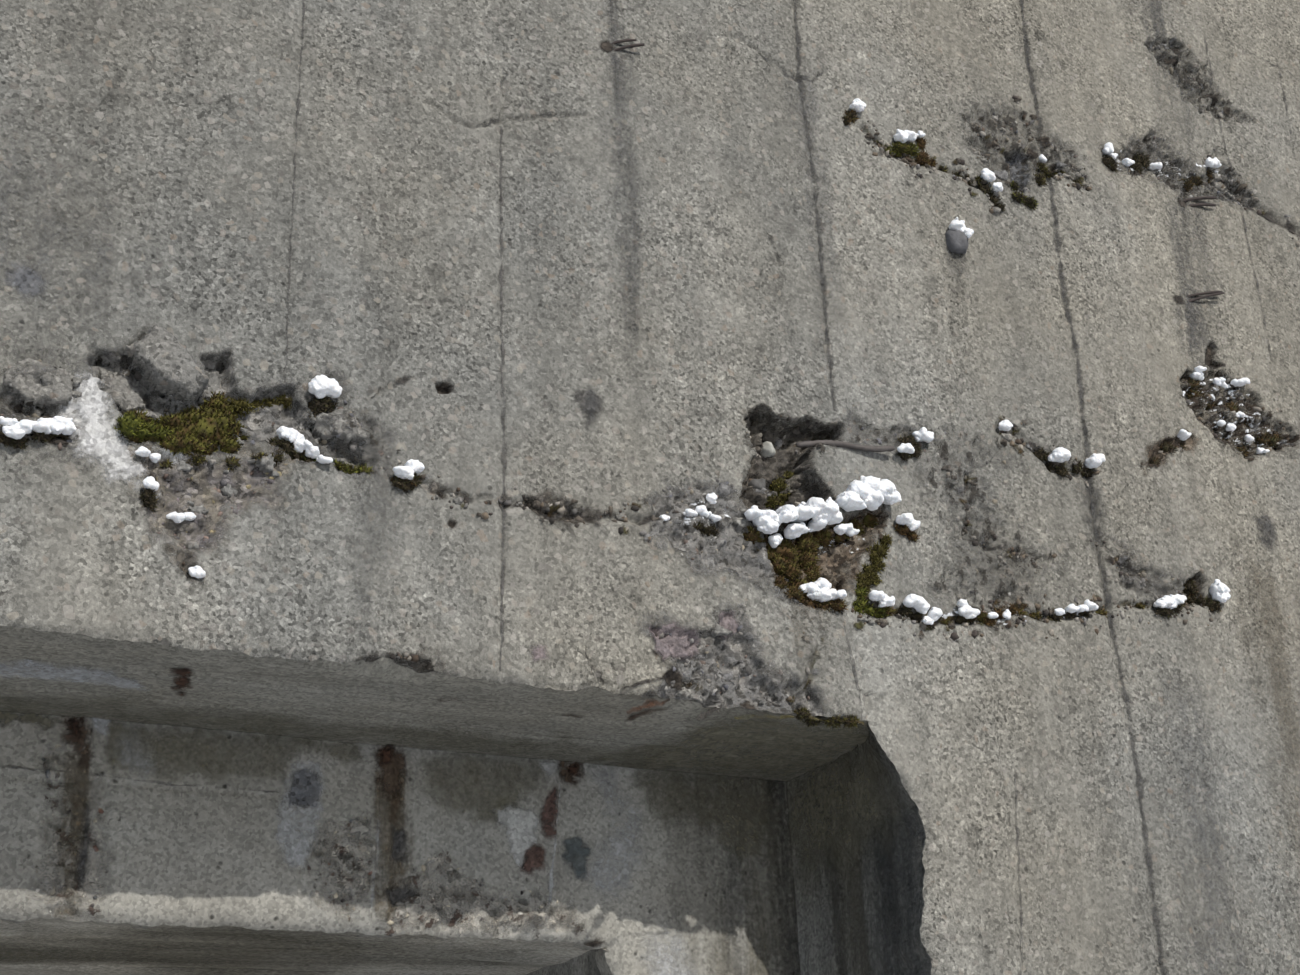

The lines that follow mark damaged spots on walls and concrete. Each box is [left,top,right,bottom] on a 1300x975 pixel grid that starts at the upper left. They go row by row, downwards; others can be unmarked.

crack [764,0,836,411]
damp [60,373,146,484]
spalling [26,348,408,581]
crack [371,376,409,399]
damp [575,389,601,425]
spalling [645,403,1055,618]
crack [786,0,1213,975]
spalling [1138,369,1300,474]
corrosion [59,715,92,912]
corrosion [374,744,414,920]
damp [70,702,931,975]
corrosion [559,761,584,785]